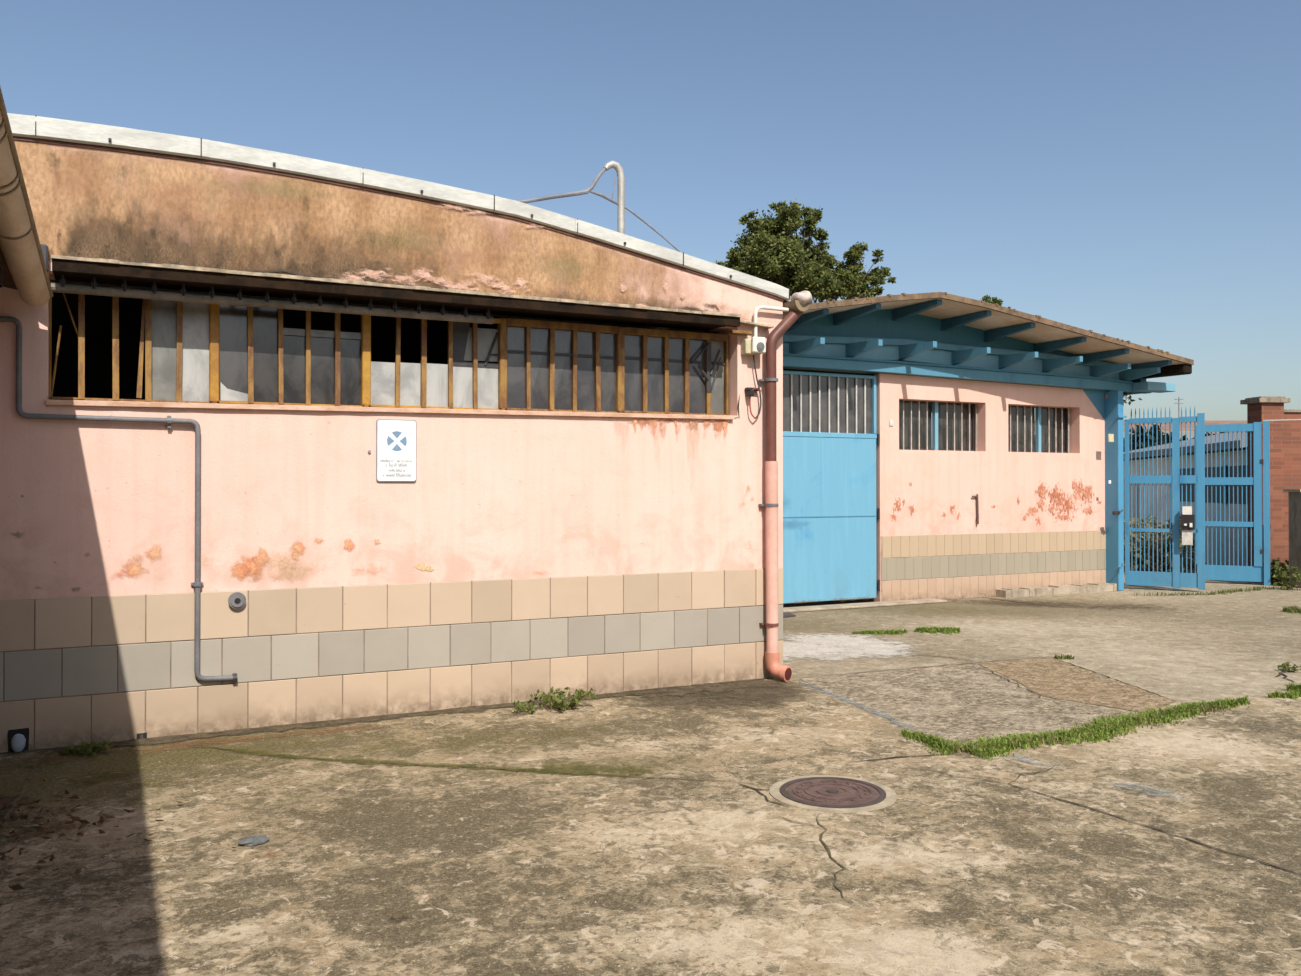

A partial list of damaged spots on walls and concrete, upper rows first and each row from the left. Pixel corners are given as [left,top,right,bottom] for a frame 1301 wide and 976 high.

water stain [14,140,717,311]
peeling [342,269,536,297]
rust [631,418,728,435]
peeling [1017,478,1102,524]
peeling [118,547,160,577]
peeling [232,539,321,579]